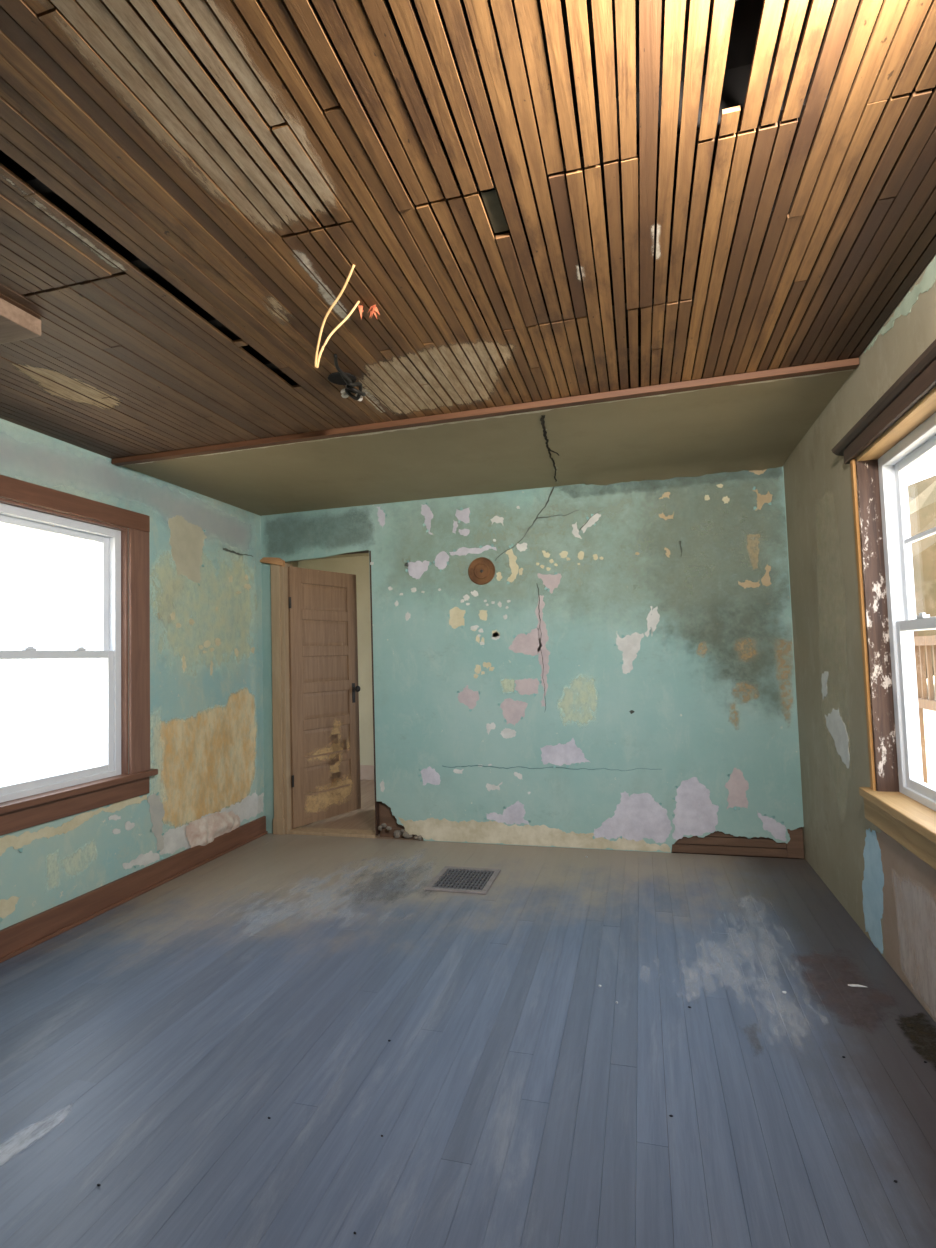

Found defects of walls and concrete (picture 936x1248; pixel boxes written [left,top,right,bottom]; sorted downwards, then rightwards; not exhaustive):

leakage [50,0,336,231]
crack [495,415,600,561]
peeling [168,515,207,586]
peeling [388,503,603,739]
peeling [614,606,660,674]
leakage [648,479,779,702]
peeling [418,764,492,785]
peeling [540,738,590,768]
flaking render [378,768,804,859]
peeling [821,671,850,768]
leakage [894,877,936,1071]